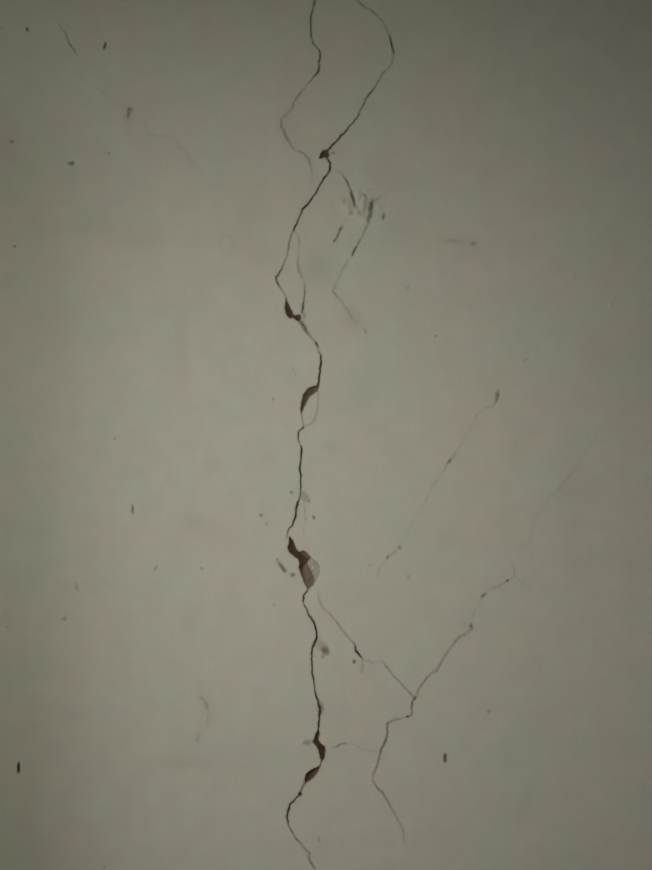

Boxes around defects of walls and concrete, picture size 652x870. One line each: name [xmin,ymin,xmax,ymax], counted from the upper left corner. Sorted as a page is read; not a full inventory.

crack [294,87,375,230]
crack [302,294,322,386]
crack [287,427,304,534]
crack [303,591,321,727]